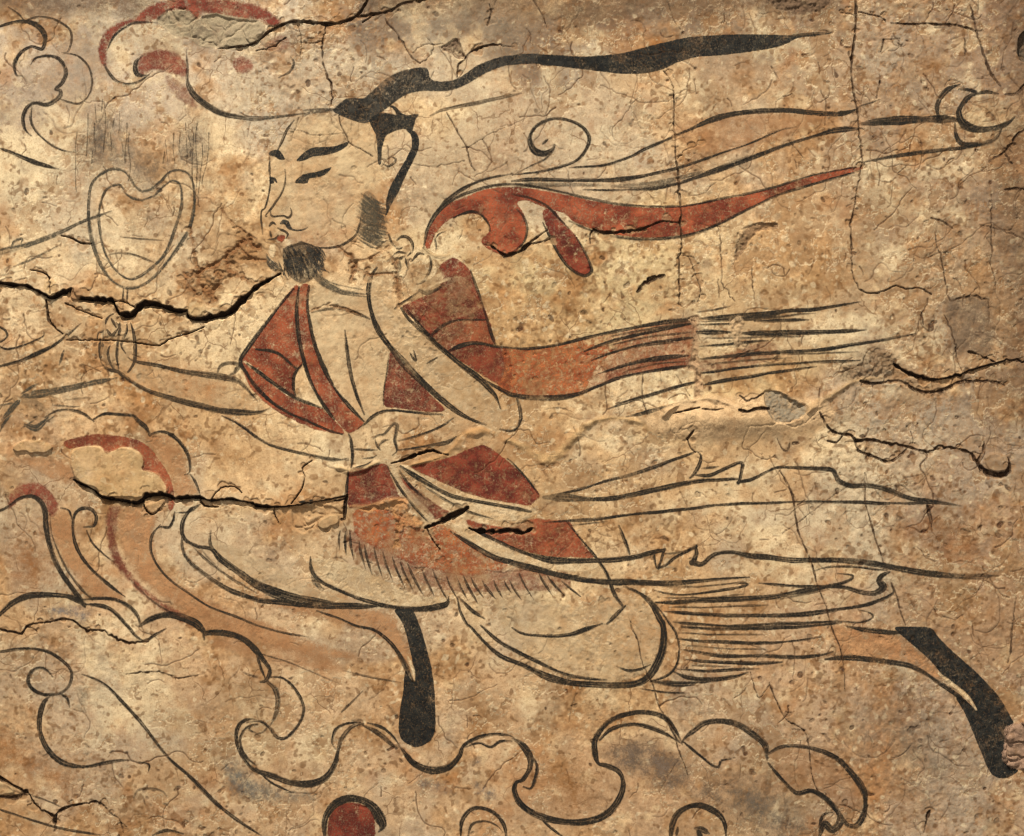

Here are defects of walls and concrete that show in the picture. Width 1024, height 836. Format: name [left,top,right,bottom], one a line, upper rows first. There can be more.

crack [457,9,509,77]
crack [230,0,435,156]
crack [848,0,1024,394]
crack [0,209,281,345]
spalling [765,391,807,422]
crack [819,412,1011,478]
crack [73,465,348,521]
crack [425,506,532,549]